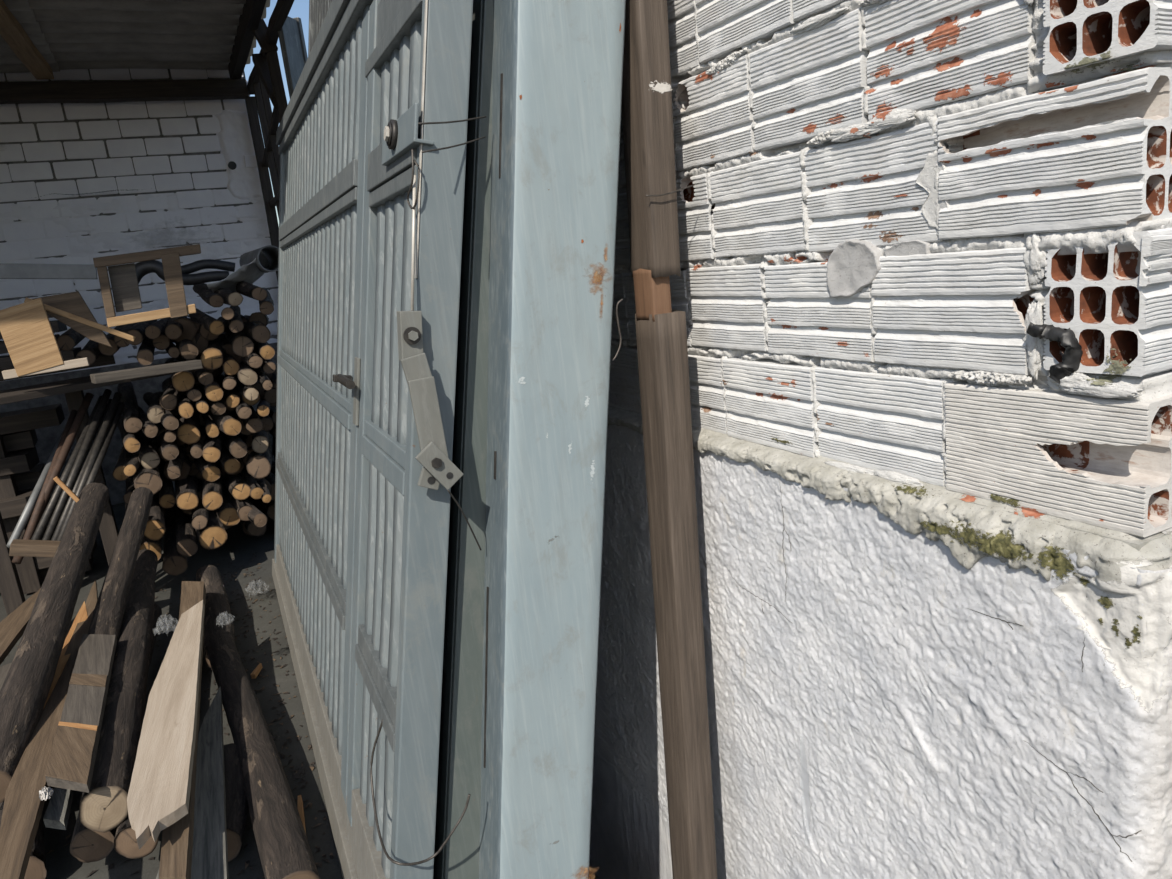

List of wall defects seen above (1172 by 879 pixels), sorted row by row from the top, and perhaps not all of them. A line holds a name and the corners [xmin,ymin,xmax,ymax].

peeling [864,9,982,94]
peeling [934,68,1012,101]
peeling [802,103,896,145]